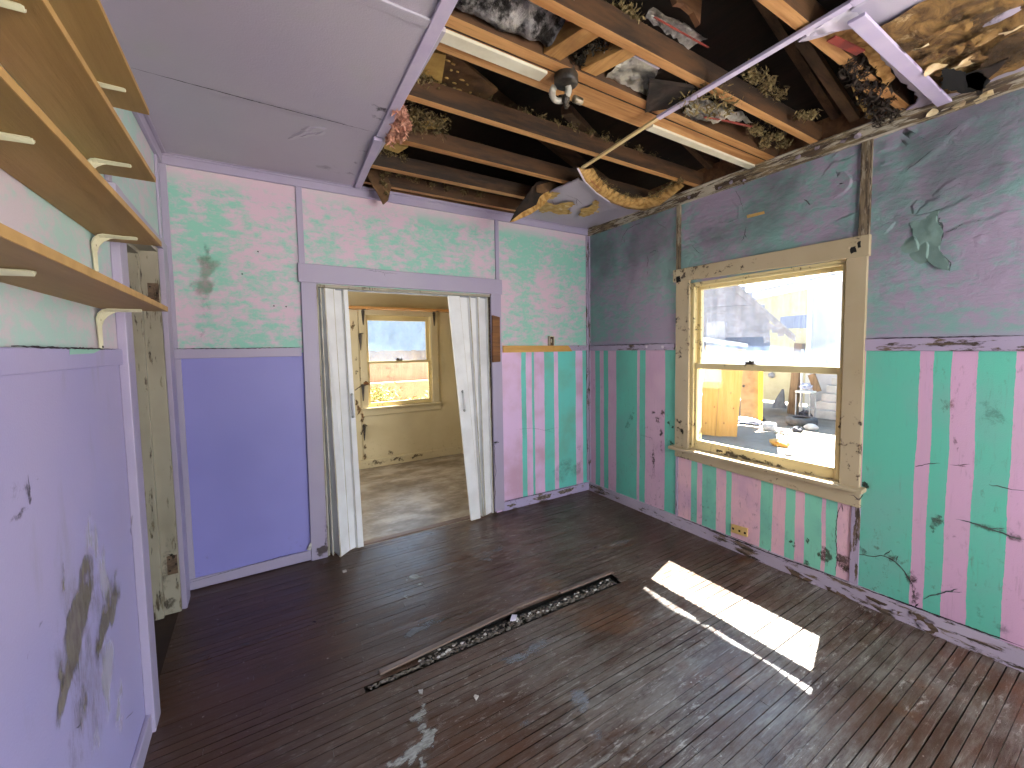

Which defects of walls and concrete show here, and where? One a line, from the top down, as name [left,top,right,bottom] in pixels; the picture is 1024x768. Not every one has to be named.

peeling [715,175,747,190]
peeling [538,192,600,217]
peeling [785,566,849,599]
crack [681,495,1023,647]
damp [58,556,93,716]
damp [97,587,120,656]
peeling [865,595,938,637]